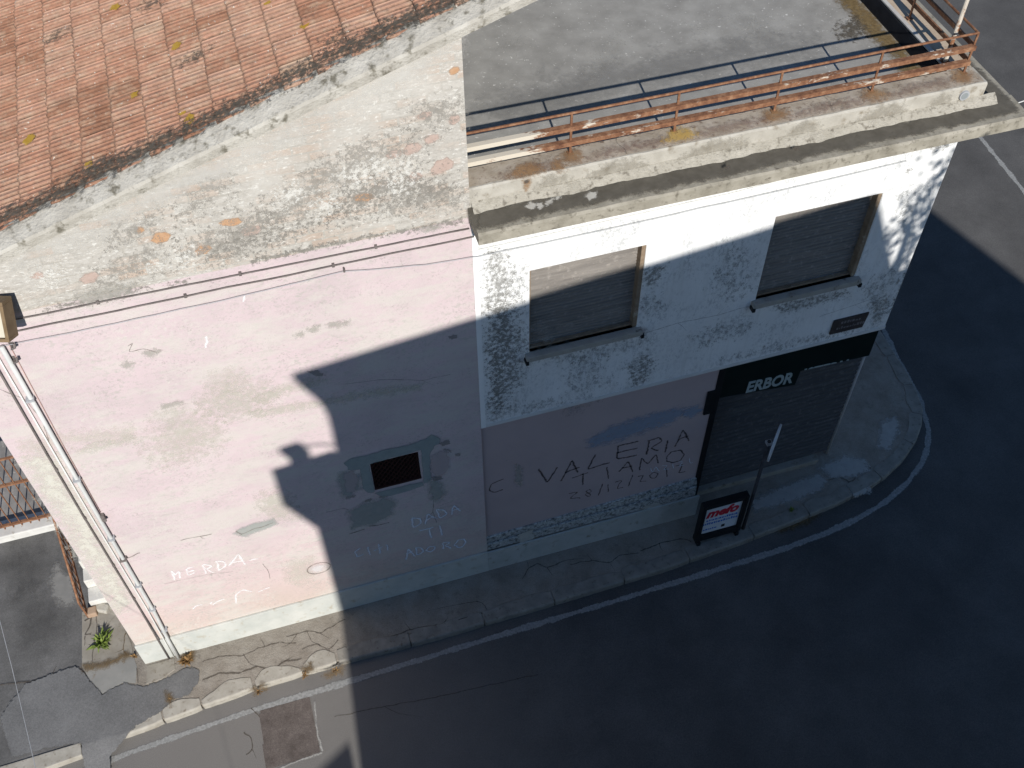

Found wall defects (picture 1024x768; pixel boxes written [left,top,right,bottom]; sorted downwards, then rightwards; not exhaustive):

peeling [344,435,460,502]
crack [202,619,345,681]